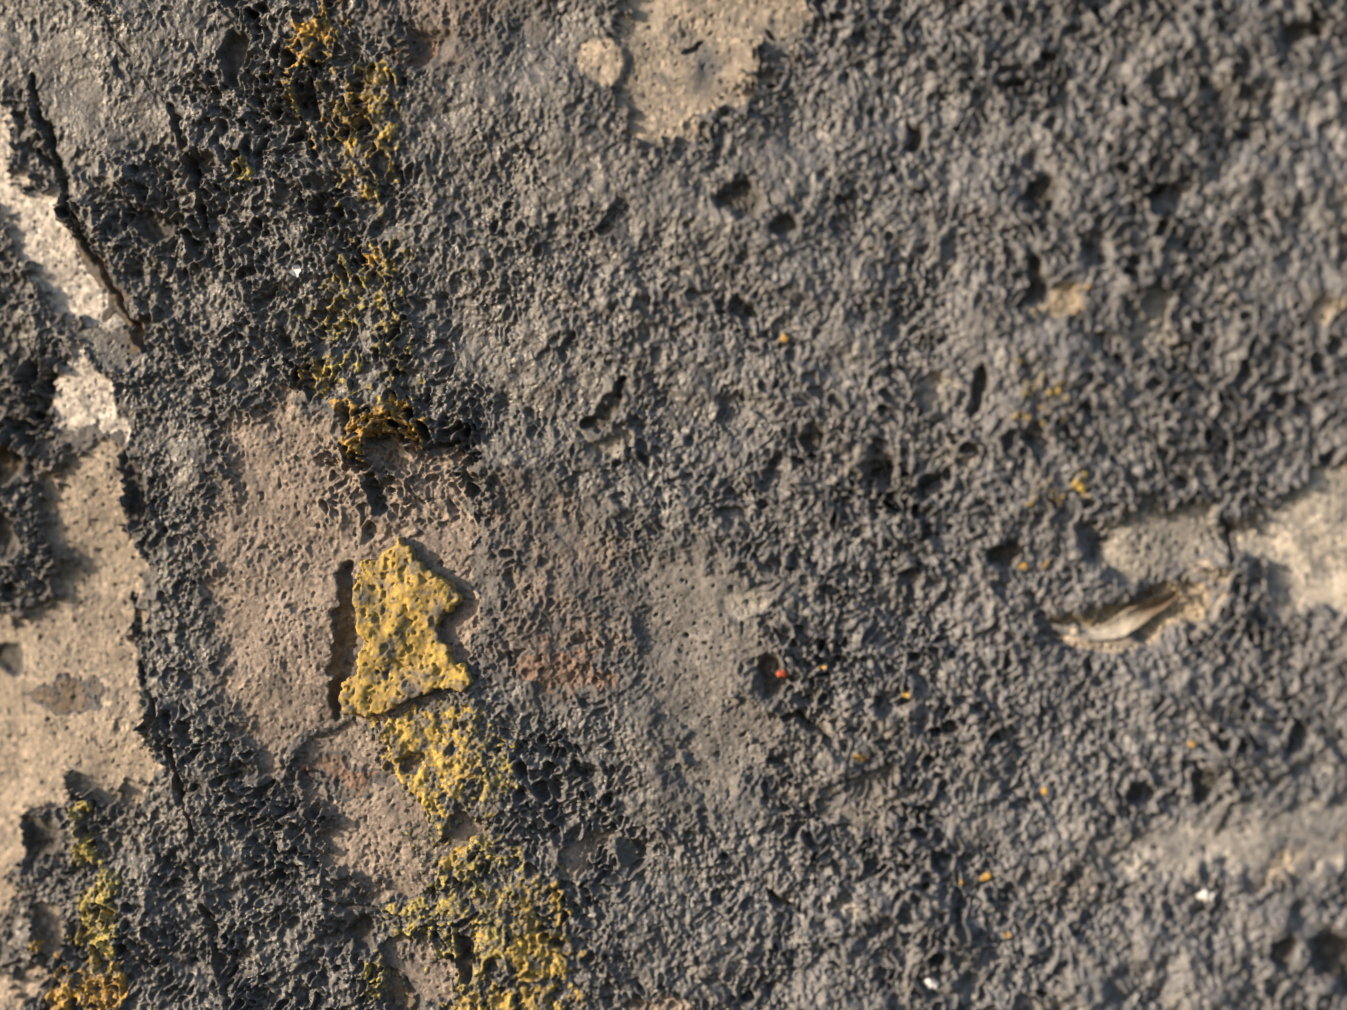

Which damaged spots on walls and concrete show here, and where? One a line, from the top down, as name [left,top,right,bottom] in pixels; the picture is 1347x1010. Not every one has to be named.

crack [27,72,96,253]
spalling [571,0,826,166]
spalling [0,102,169,1010]
spalling [1036,442,1347,660]
crack [129,590,242,989]
spalling [186,373,502,1010]
spalling [1073,764,1347,913]